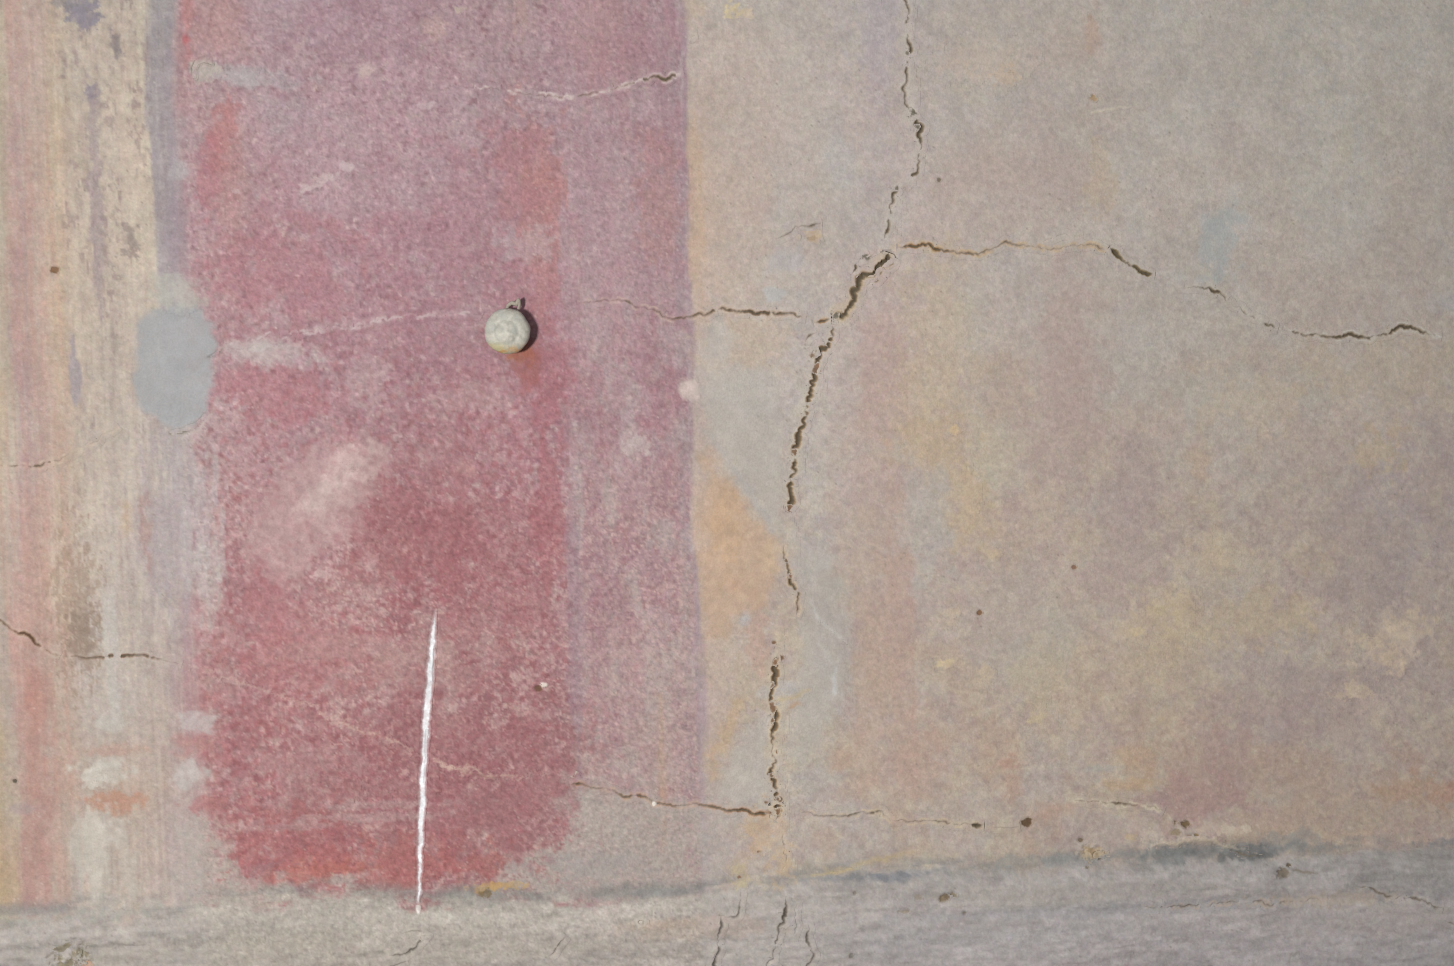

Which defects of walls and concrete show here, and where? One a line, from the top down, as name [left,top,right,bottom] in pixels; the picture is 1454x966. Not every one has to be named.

crack [474,30,699,104]
crack [224,307,485,349]
crack [568,0,1454,966]
crack [0,611,184,670]
crack [382,925,434,966]